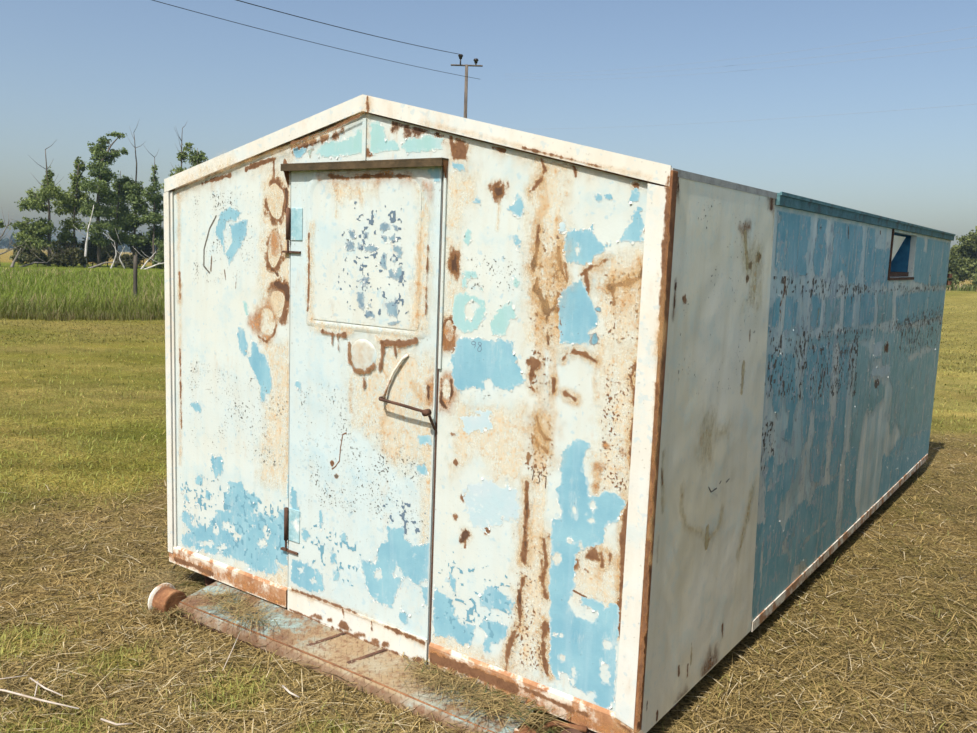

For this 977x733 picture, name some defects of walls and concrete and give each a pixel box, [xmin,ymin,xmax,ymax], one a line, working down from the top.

peeling [193,193,253,282]
rust [245,96,369,480]
peeling [292,120,444,159]
peeling [338,201,409,326]
peeling [450,188,645,400]
rust [522,146,599,345]
rust [657,176,687,358]
peeling [180,301,636,709]
rust [172,334,658,733]
rust [562,251,643,637]
rust [649,382,663,517]
peeling [752,211,950,619]